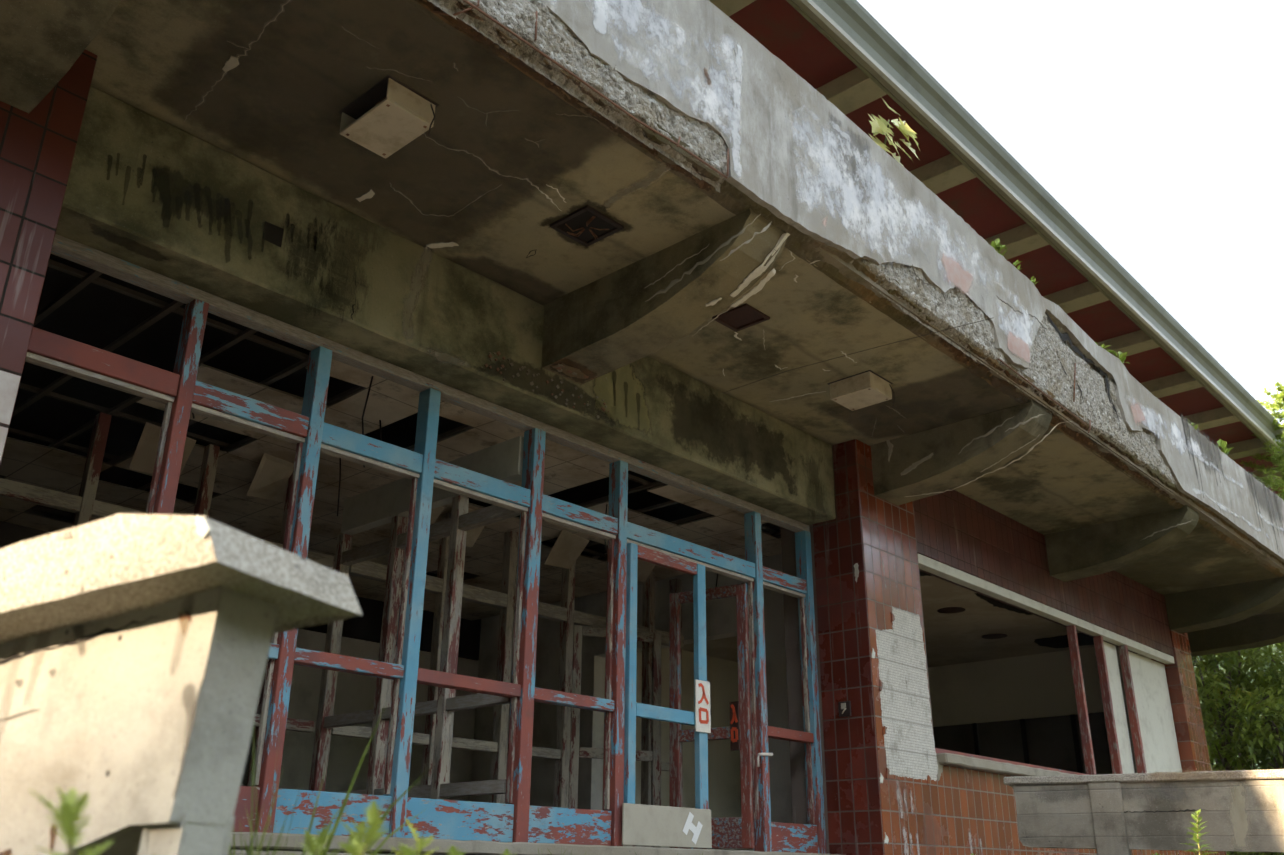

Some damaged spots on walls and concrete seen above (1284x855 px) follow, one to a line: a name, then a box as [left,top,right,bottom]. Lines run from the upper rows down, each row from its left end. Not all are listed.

crack [184,0,290,122]
water stain [155,0,612,338]
corrosion [417,0,721,191]
spalling [416,0,1284,577]
corrosion [919,320,1178,501]
spalling [195,516,211,538]
peeling [871,606,944,785]